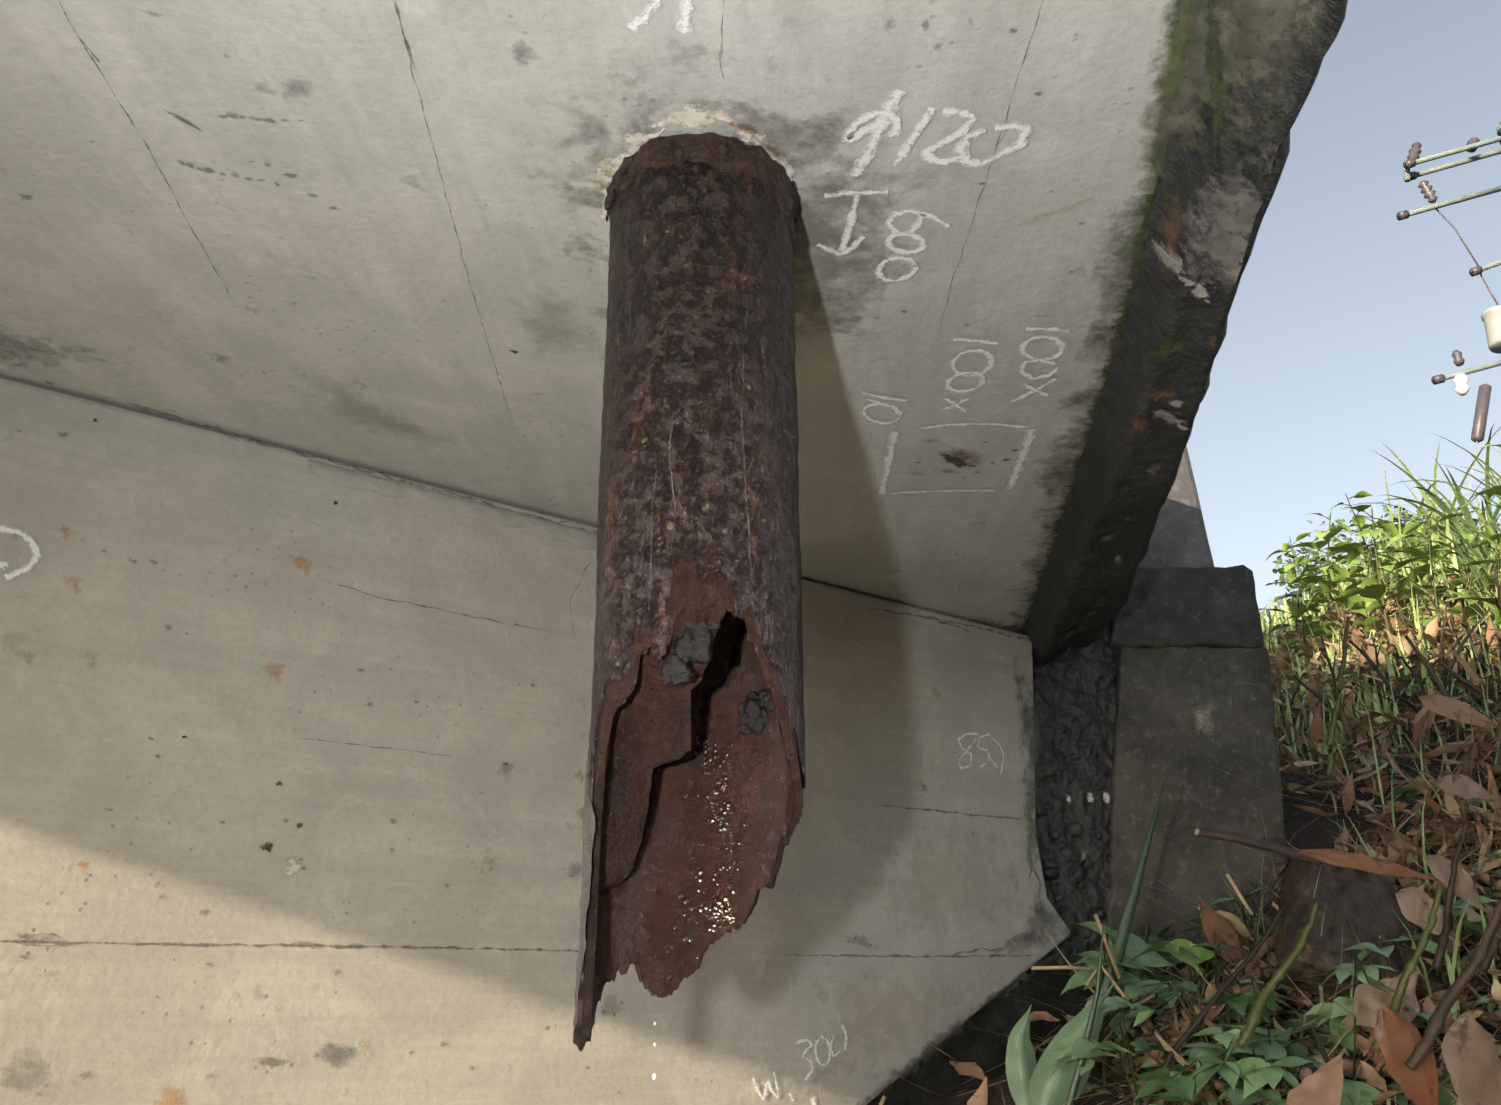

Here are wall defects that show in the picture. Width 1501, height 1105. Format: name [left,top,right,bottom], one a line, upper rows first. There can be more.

crack [168,112,201,131]
leakage [582,104,837,223]
leakage [793,182,876,325]
leakage [972,196,1156,640]
peeling [598,572,728,891]